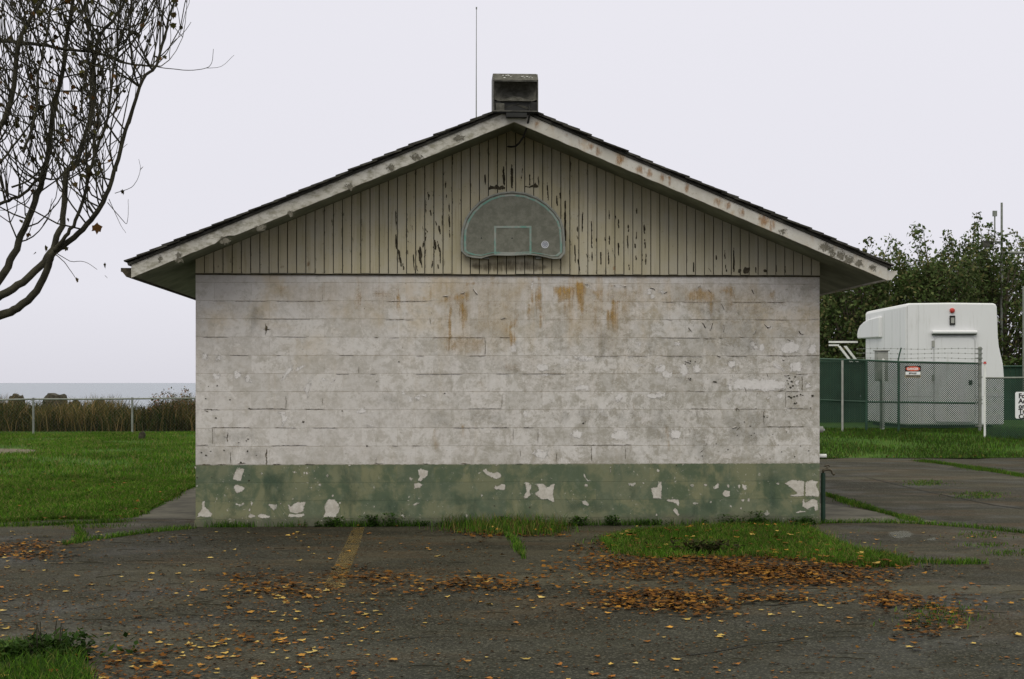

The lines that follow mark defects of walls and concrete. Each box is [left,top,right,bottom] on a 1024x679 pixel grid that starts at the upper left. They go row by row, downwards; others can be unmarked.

peeling [395,183,450,271]
peeling [708,250,786,274]
corrosion [557,282,583,298]
peeling [233,439,305,518]
peeling [409,469,428,489]
peeling [483,465,505,490]
peeling [197,501,212,517]
peeling [323,495,340,518]
peeling [524,482,555,508]
peeling [628,469,680,516]
peeling [690,483,750,510]
peeling [776,480,819,513]